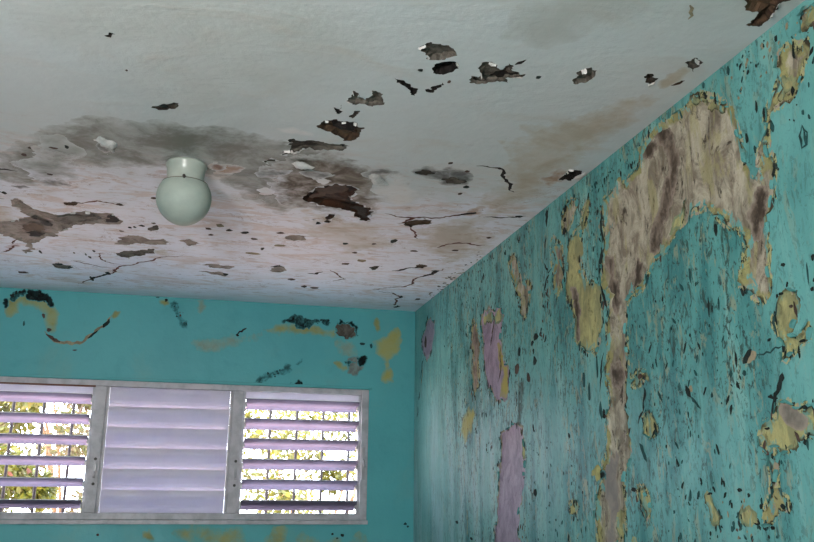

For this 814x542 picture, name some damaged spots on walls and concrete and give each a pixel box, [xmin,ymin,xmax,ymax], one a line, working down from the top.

spalling [469,60,526,84]
spalling [0,198,175,259]
water stain [0,115,420,254]
peeling [260,314,359,339]
spalling [411,162,474,195]
crack [385,206,523,239]
peeling [393,253,542,444]
crack [484,166,514,192]
water stain [407,94,661,263]
water stain [540,238,551,342]
water stain [588,205,607,309]
peeling [549,0,814,542]